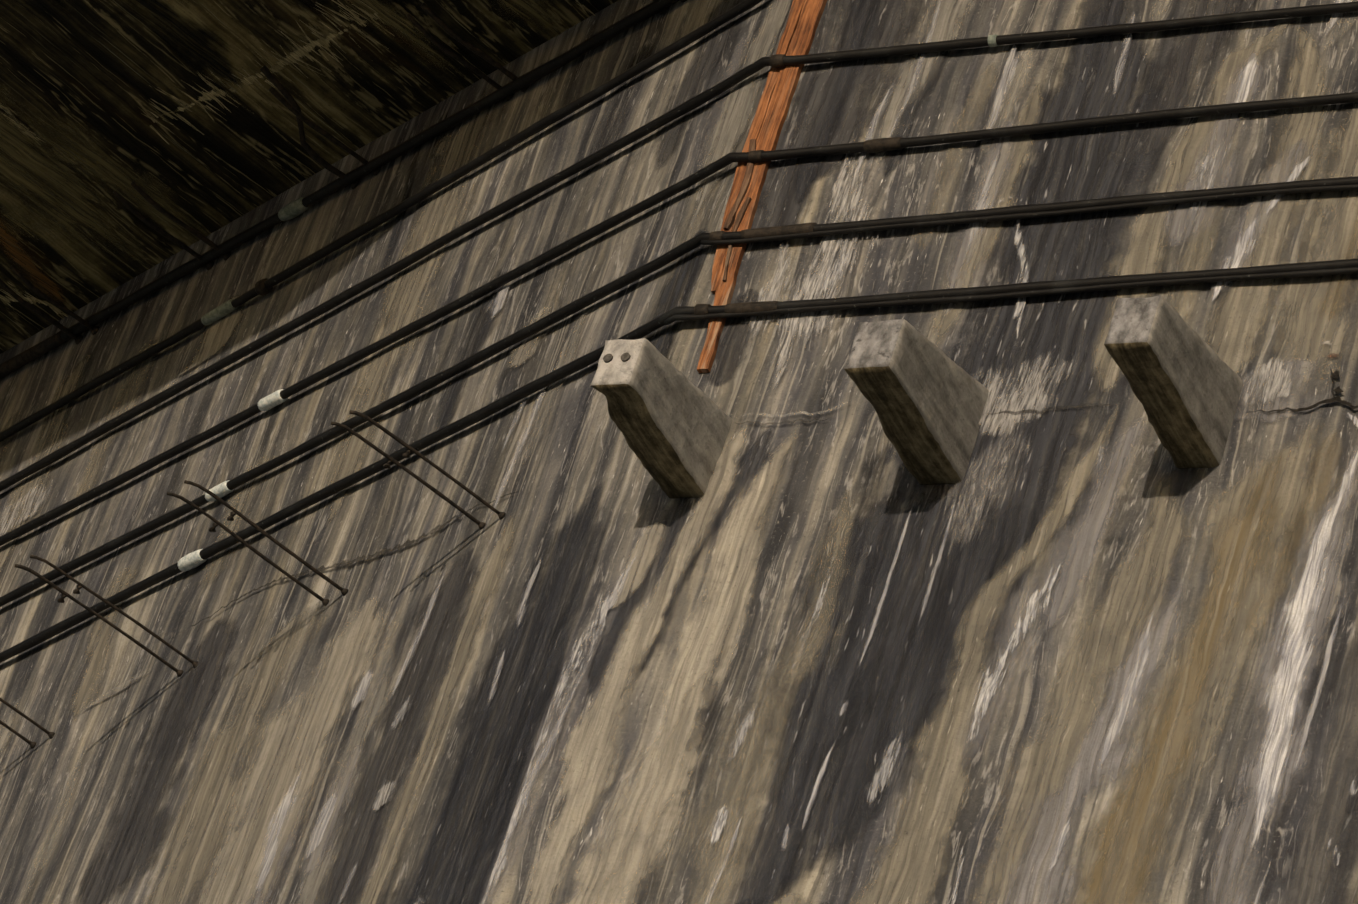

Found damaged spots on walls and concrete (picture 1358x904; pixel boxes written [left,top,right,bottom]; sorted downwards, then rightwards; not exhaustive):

water stain [585,46,653,174]
water stain [648,0,791,358]
water stain [0,358,88,567]
water stain [81,342,157,494]
water stain [180,296,242,375]
water stain [327,94,491,520]
water stain [437,272,507,429]
water stain [512,309,547,365]
water stain [695,0,1358,904]
crack [1249,368,1358,413]
water stain [74,517,514,904]
water stain [398,429,794,904]